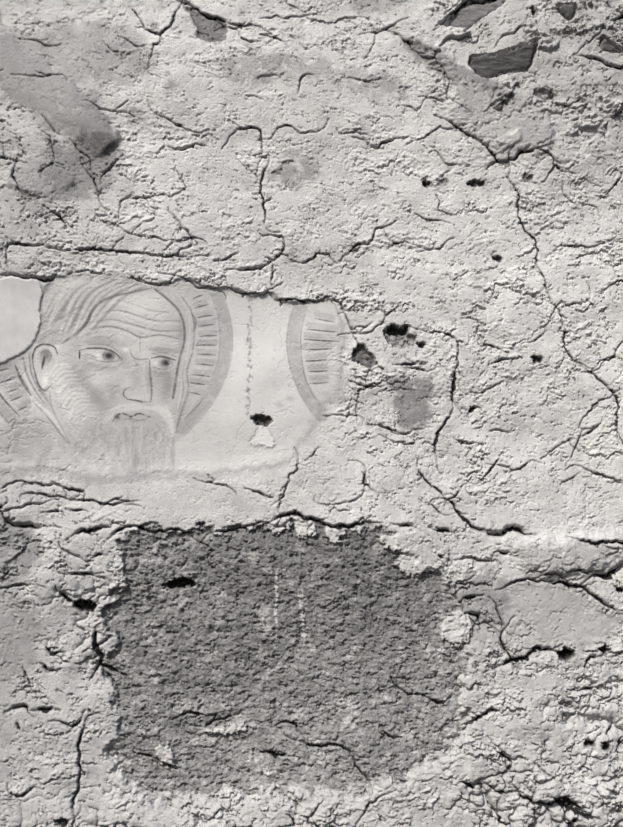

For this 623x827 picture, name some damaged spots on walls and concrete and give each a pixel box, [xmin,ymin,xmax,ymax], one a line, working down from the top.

water stain [6,22,149,74]
flaking render [449,0,505,30]
flaking render [470,42,538,79]
water stain [47,139,109,196]
crack [422,50,559,282]
crack [380,326,526,561]
crack [0,449,370,604]
crack [508,540,623,615]
spalling [102,513,473,801]
crack [464,584,561,666]
crack [7,705,96,826]
crack [463,747,604,827]